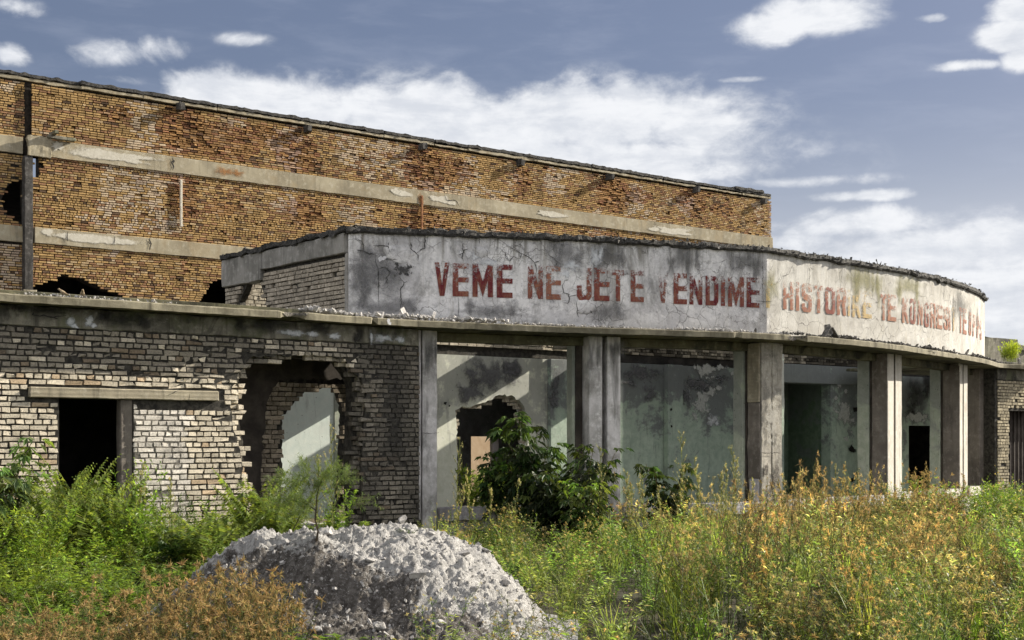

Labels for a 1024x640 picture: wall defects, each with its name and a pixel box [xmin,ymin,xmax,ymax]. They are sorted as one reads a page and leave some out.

crack [355,239,426,307]
peeling [683,364,734,426]